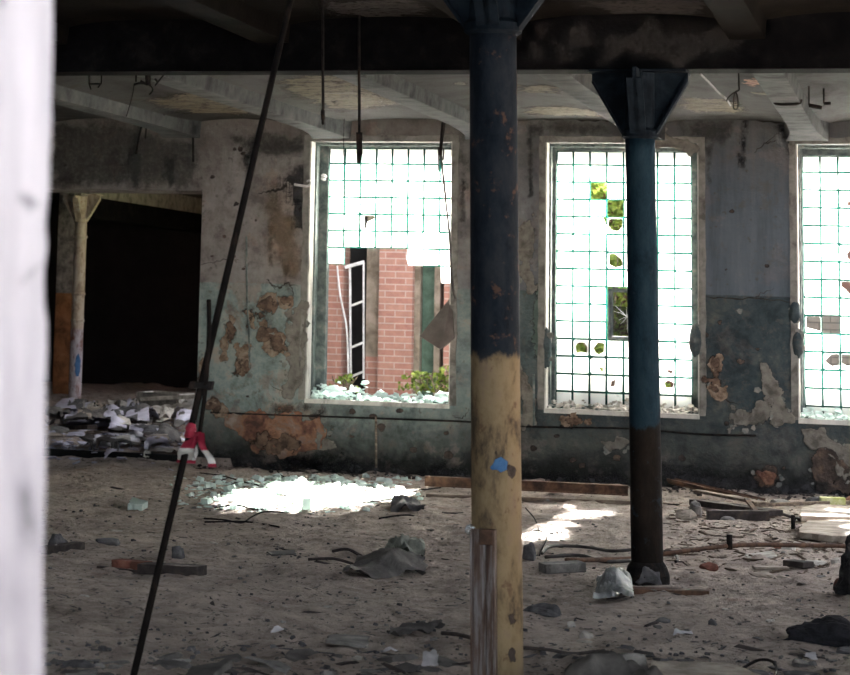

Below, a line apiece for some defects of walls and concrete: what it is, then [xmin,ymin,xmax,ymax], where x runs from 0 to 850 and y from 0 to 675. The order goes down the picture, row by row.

damp [145,93,250,115]
damp [276,75,401,113]
spalling [218,292,310,399]
spalling [205,397,337,459]
spalling [600,435,629,461]
spalling [701,353,850,495]